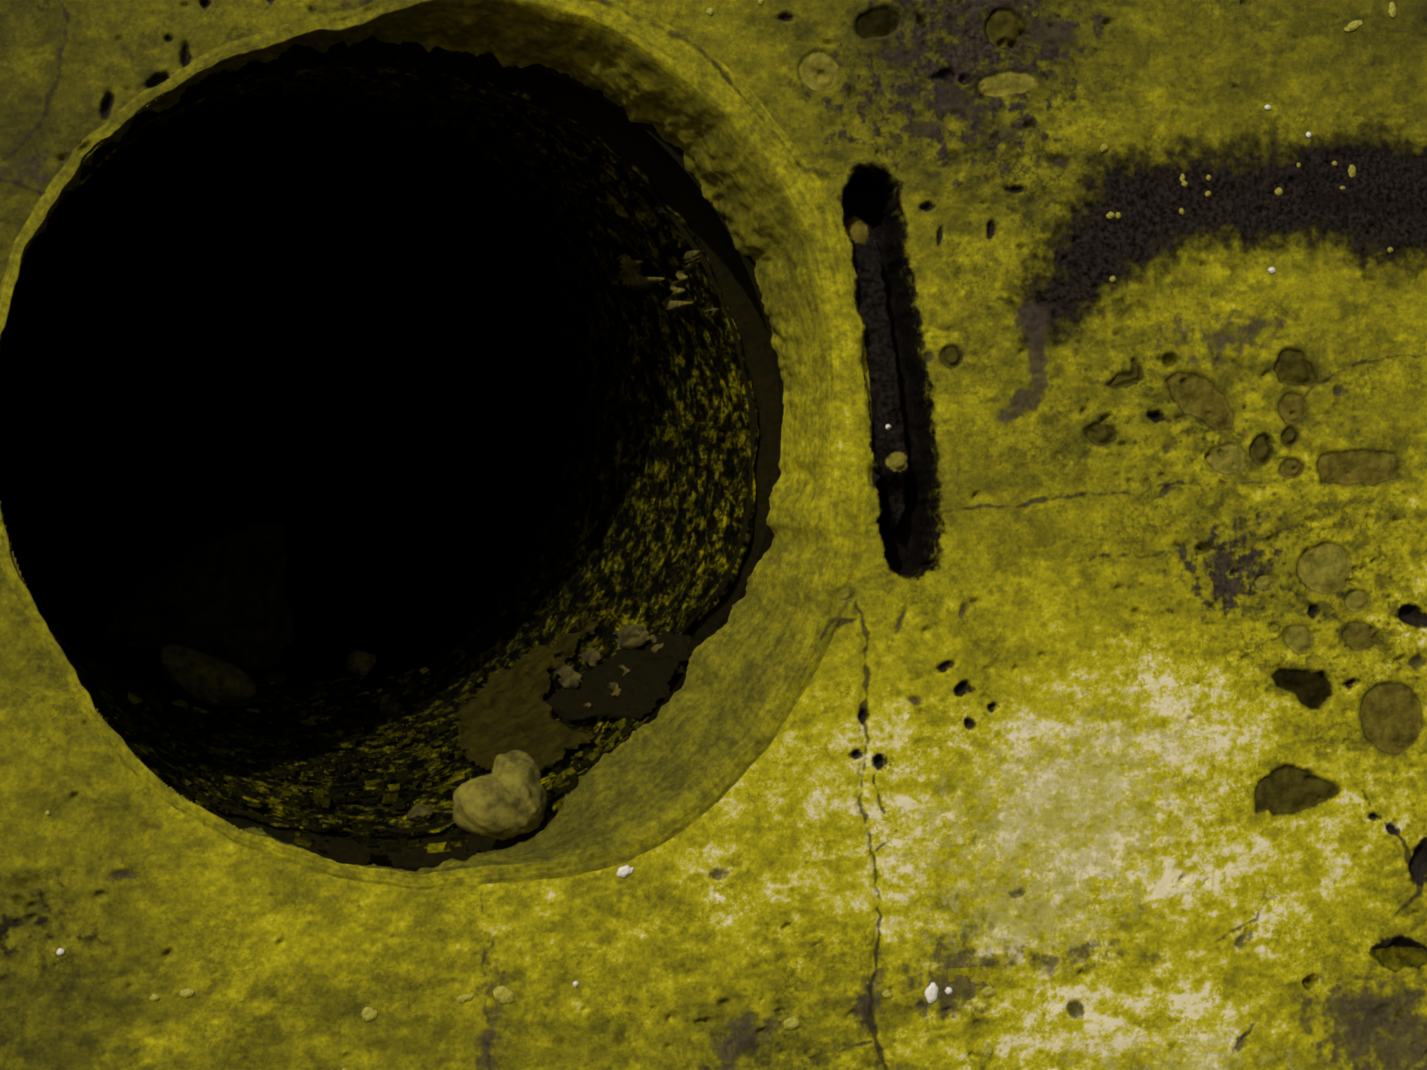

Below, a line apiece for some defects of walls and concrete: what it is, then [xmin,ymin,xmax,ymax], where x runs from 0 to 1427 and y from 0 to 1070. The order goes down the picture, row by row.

damp [998,129,1427,422]
crack [810,603,887,1070]